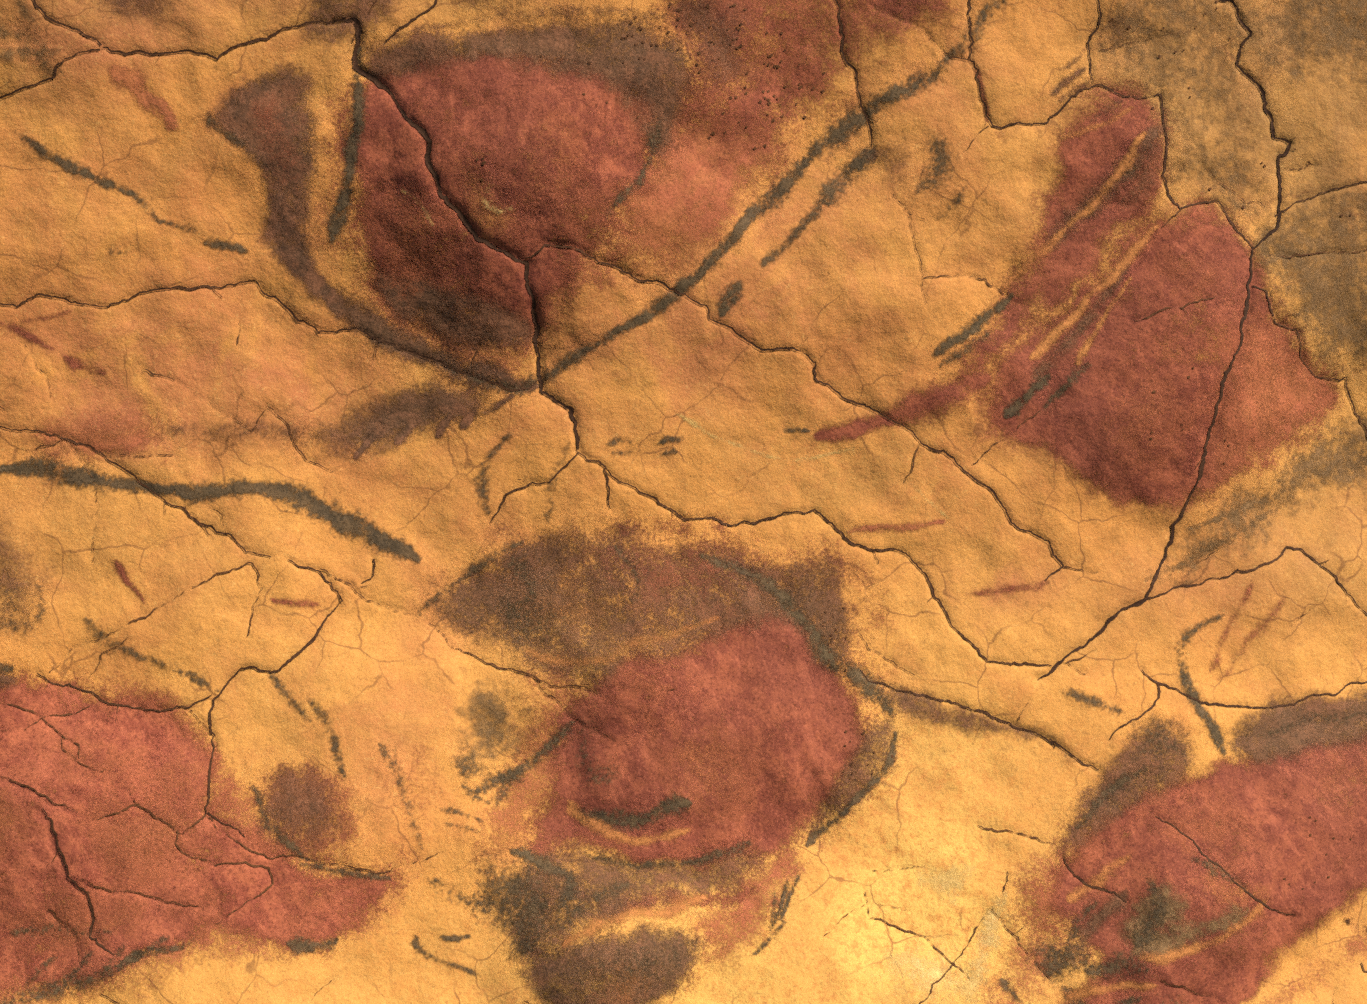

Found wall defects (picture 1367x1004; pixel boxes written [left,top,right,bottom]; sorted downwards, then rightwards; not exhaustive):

crack [0,0,1367,770]
crack [0,406,615,956]
crack [824,865,1053,1004]
crack [978,825,1127,903]
crack [1161,980,1210,996]
crack [1156,816,1296,916]